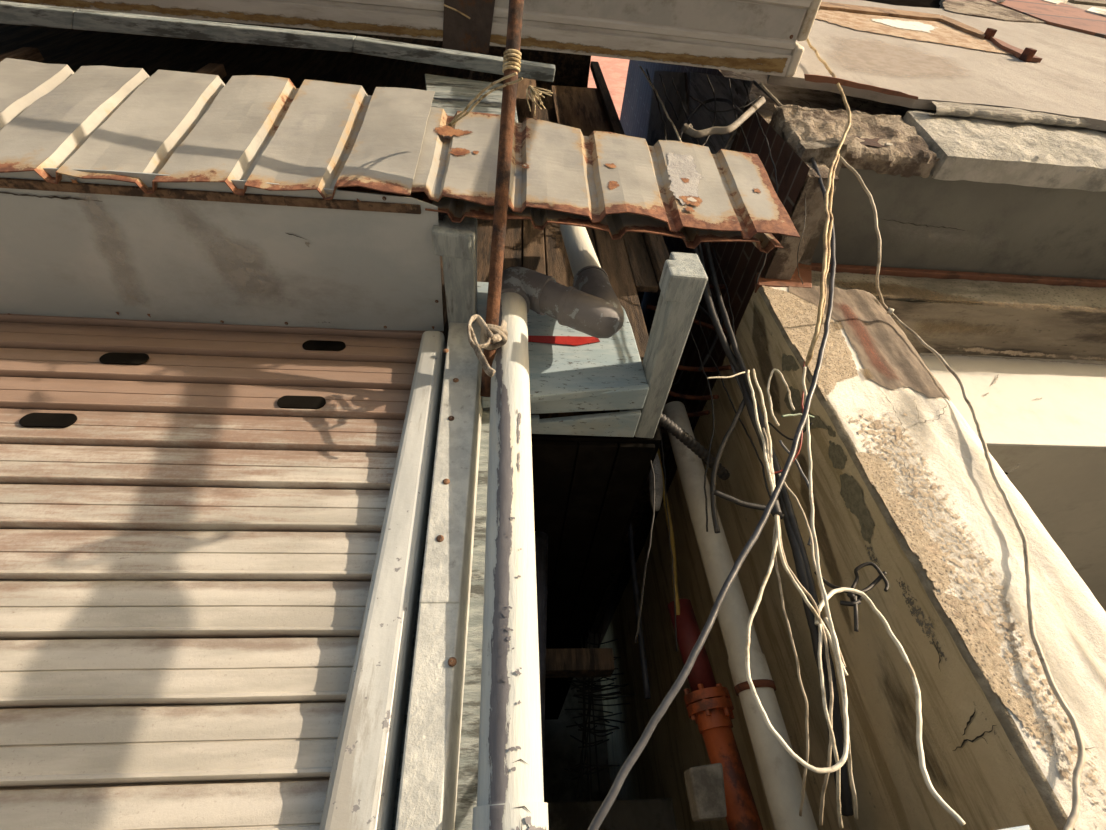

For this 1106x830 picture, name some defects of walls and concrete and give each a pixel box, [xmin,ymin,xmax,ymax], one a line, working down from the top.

rust [0,192,103,202]
rust [434,125,479,156]
rust [679,178,703,212]
peeling [763,286,858,401]
crack [876,383,947,495]
peeling [488,347,546,830]
peeling [784,386,1106,811]
crack [953,712,996,751]